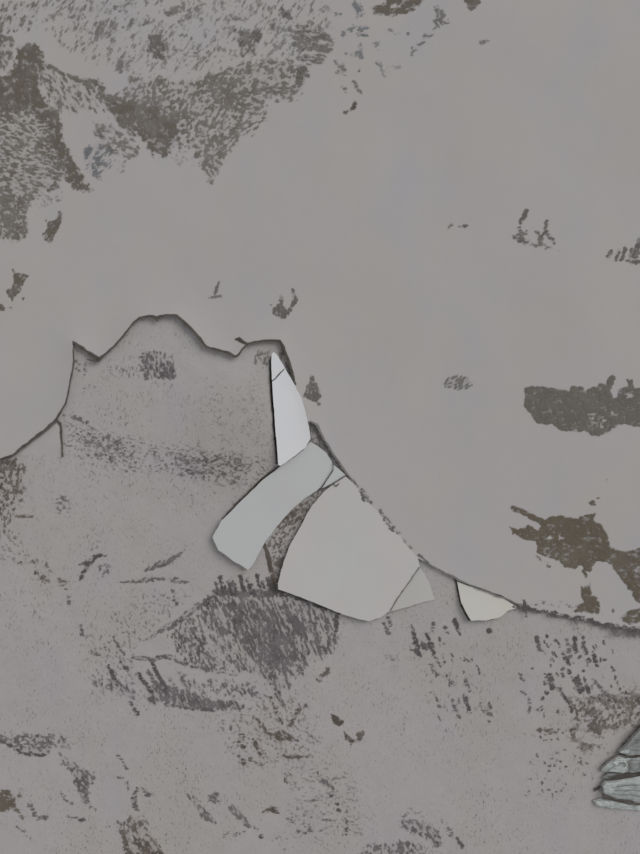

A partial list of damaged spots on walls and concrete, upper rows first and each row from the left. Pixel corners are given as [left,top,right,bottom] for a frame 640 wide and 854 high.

peeling [0,0,346,240]
peeling [0,316,640,854]